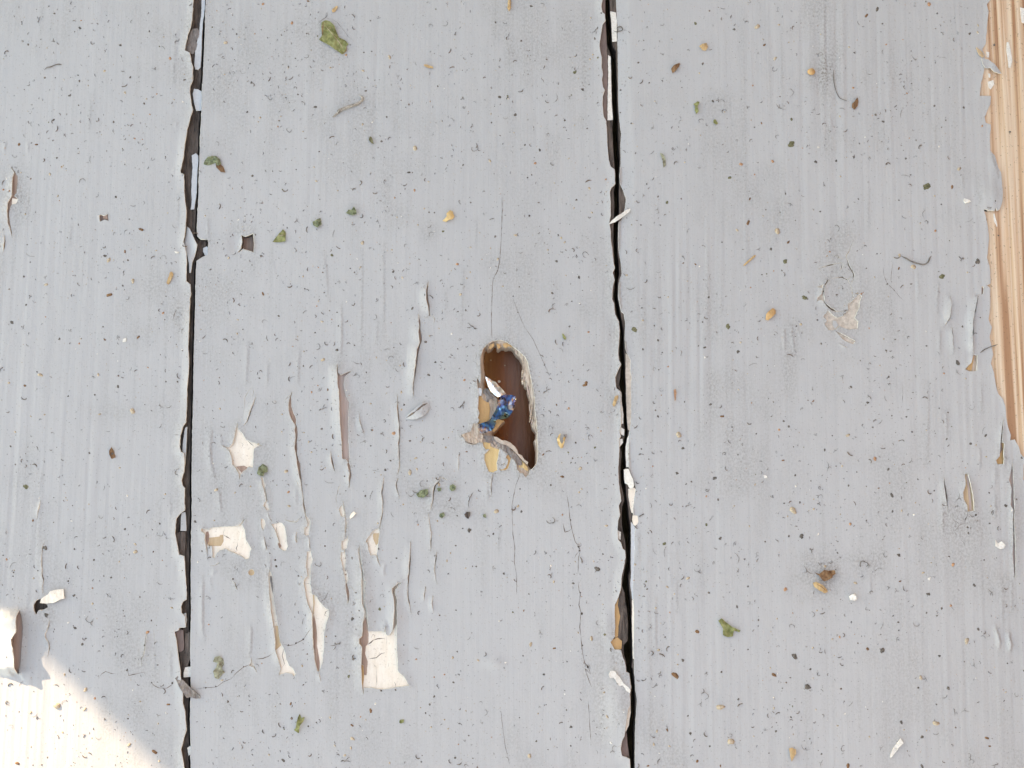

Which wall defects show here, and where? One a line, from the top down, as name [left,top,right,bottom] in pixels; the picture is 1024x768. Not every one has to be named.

peeling [186,28,199,54]
peeling [337,368,351,461]
spalling [462,340,538,477]
peeling [224,425,311,550]
peeling [11,611,23,674]
peeling [202,520,254,575]
peeling [269,571,296,676]
peeling [304,552,329,671]
peeling [339,506,409,692]